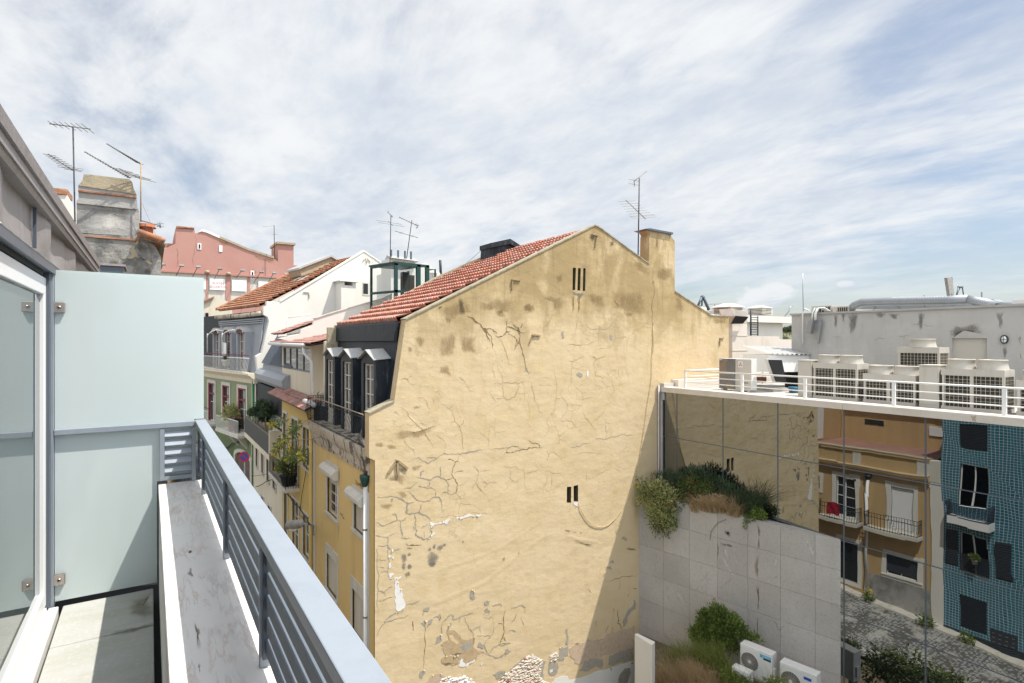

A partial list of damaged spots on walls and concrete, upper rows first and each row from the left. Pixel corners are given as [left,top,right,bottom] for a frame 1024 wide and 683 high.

crack [376,281,655,667]
peeling [428,514,482,539]
peeling [388,549,406,612]
spalling [419,607,484,683]
spalling [493,600,636,683]